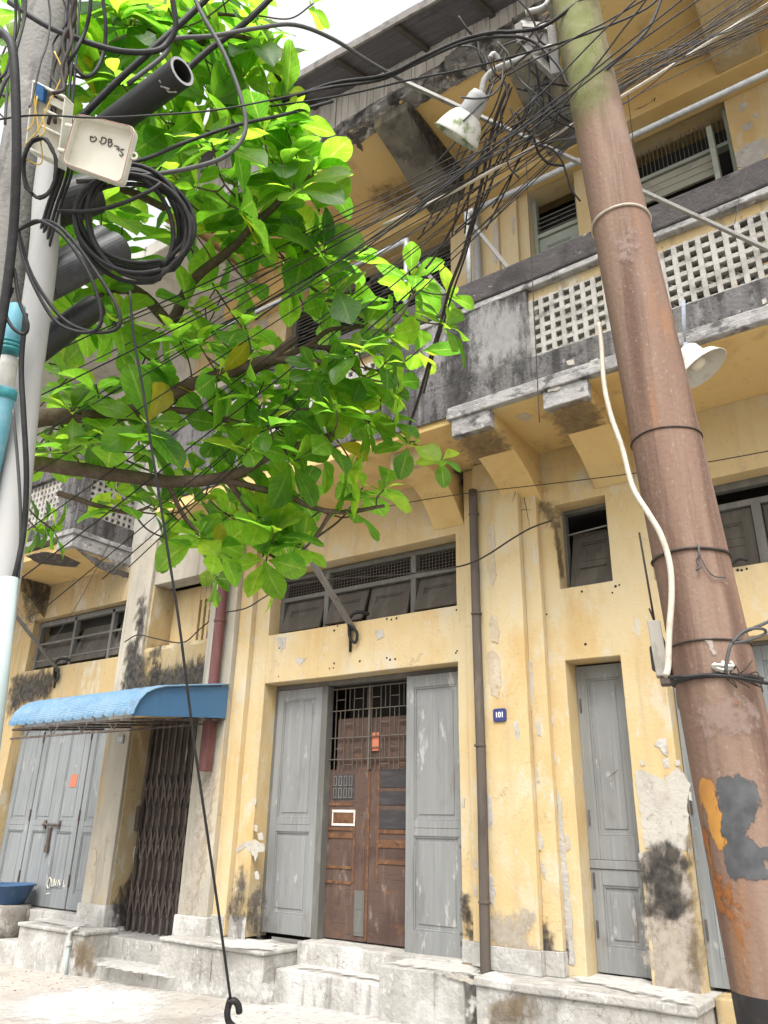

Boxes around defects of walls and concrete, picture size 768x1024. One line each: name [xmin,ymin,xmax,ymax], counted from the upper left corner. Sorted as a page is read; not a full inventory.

damp [402,287,531,407]
damp [453,427,511,486]
damp [544,401,605,437]
damp [7,669,54,713]
damp [121,597,205,690]
peeling [486,615,501,699]
damp [227,866,267,940]
peeling [236,825,265,880]
peeling [557,787,575,965]
peeling [635,738,702,994]
damp [638,835,709,993]
corrosion [698,777,749,942]